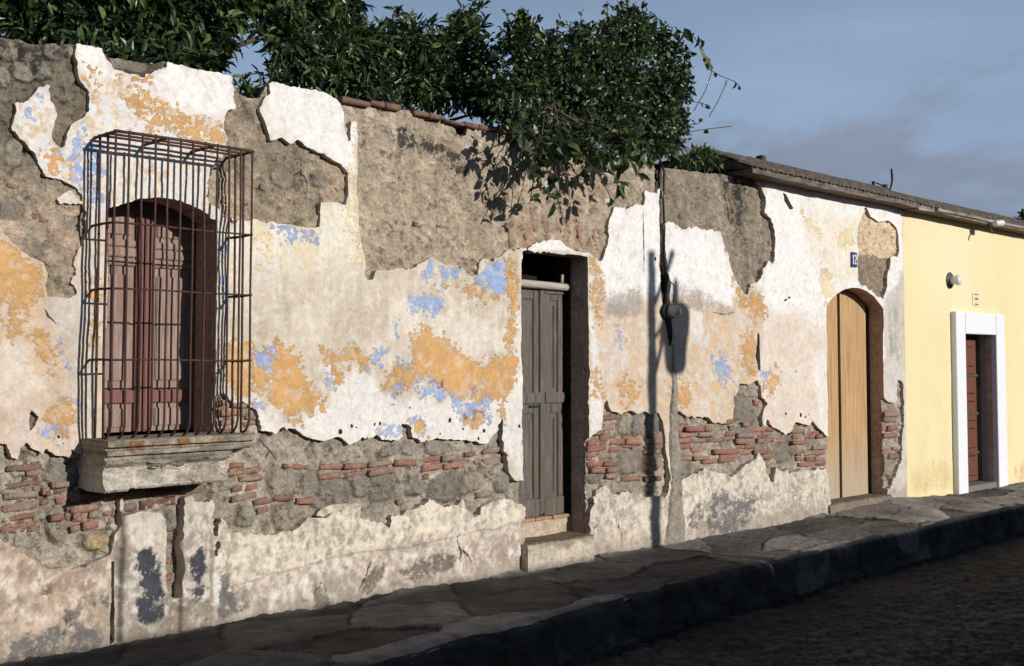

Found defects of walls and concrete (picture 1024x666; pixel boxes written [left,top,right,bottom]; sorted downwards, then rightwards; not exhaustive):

spalling [0,37,828,597]
peeling [819,267,835,307]
spalling [835,208,897,297]
spalling [880,381,902,489]
damp [135,546,165,624]
damp [190,547,207,602]